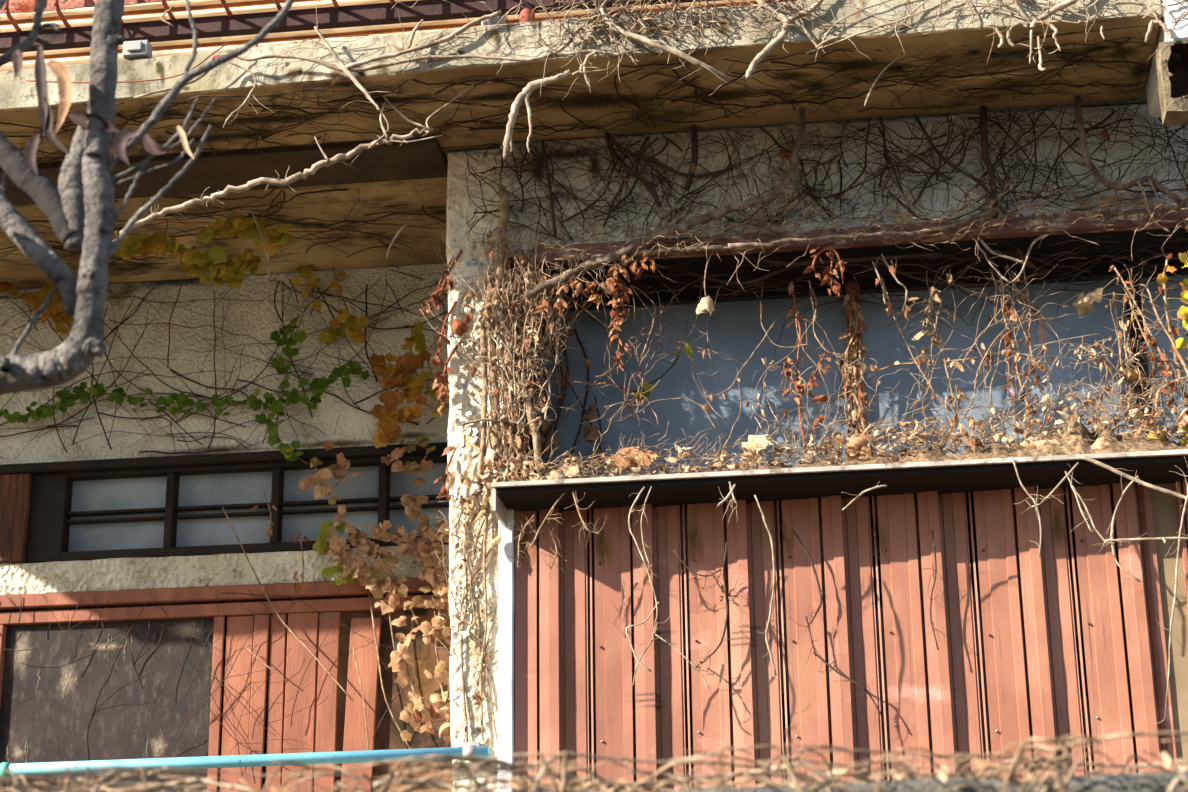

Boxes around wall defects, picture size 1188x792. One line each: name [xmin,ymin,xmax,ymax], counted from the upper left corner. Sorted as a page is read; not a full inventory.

spalling [1168,51,1182,70]